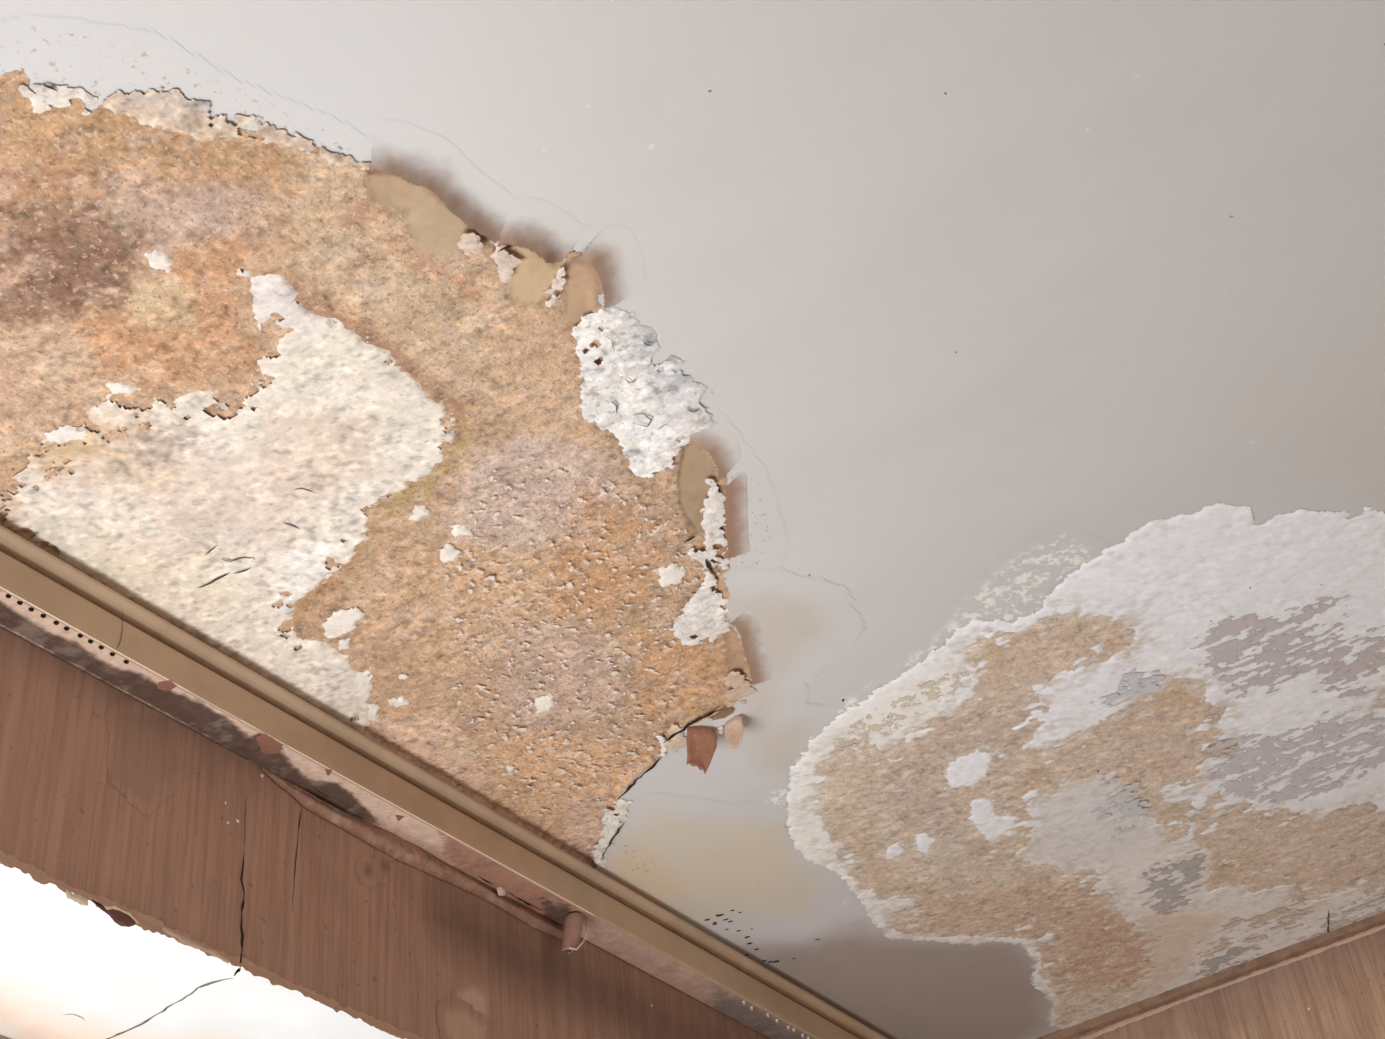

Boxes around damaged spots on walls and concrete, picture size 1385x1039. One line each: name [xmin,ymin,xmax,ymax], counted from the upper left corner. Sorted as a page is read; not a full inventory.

flaking render [0,13,791,869]
crack [66,808,246,1039]
crack [292,808,302,908]
peeling [754,502,1385,1039]